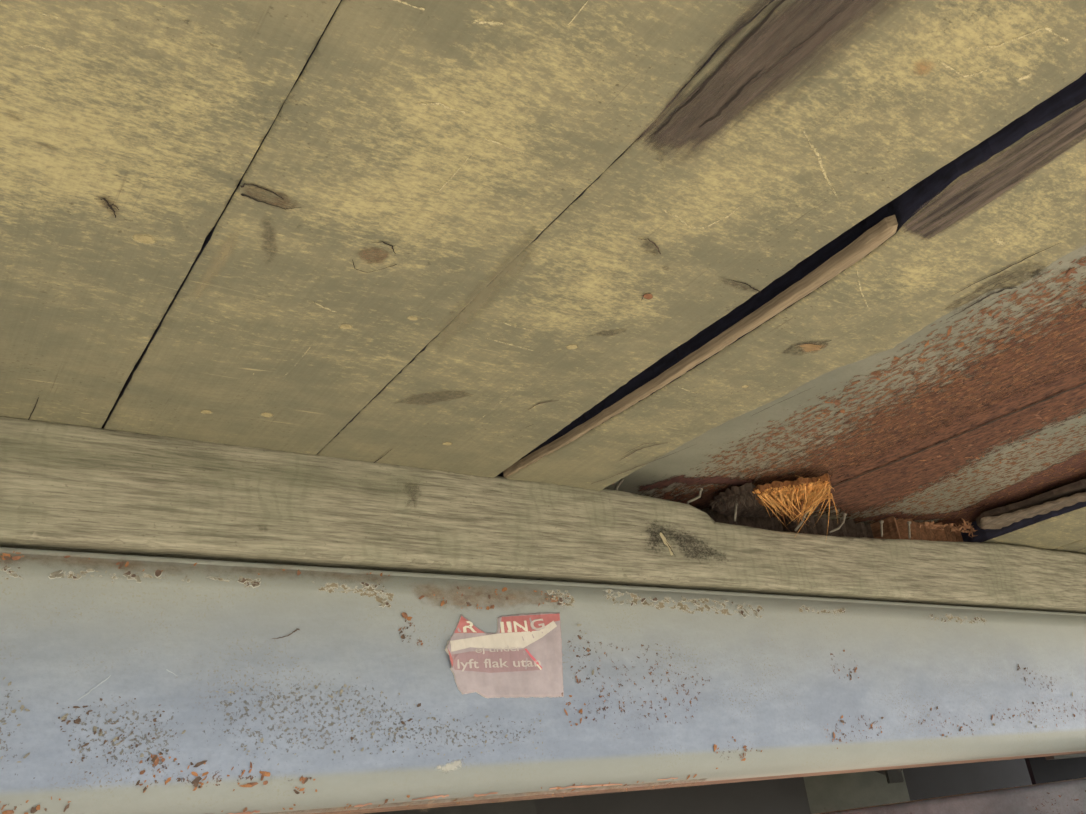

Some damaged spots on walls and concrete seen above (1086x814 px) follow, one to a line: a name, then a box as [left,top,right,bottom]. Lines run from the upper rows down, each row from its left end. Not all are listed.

rust [638,251,1086,527]
rust [398,612,423,645]
rust [562,624,710,730]
rust [0,677,30,774]
rust [57,673,544,793]
rust [826,715,884,749]
rust [918,692,1086,738]
rust [0,797,71,814]
rust [283,776,317,811]